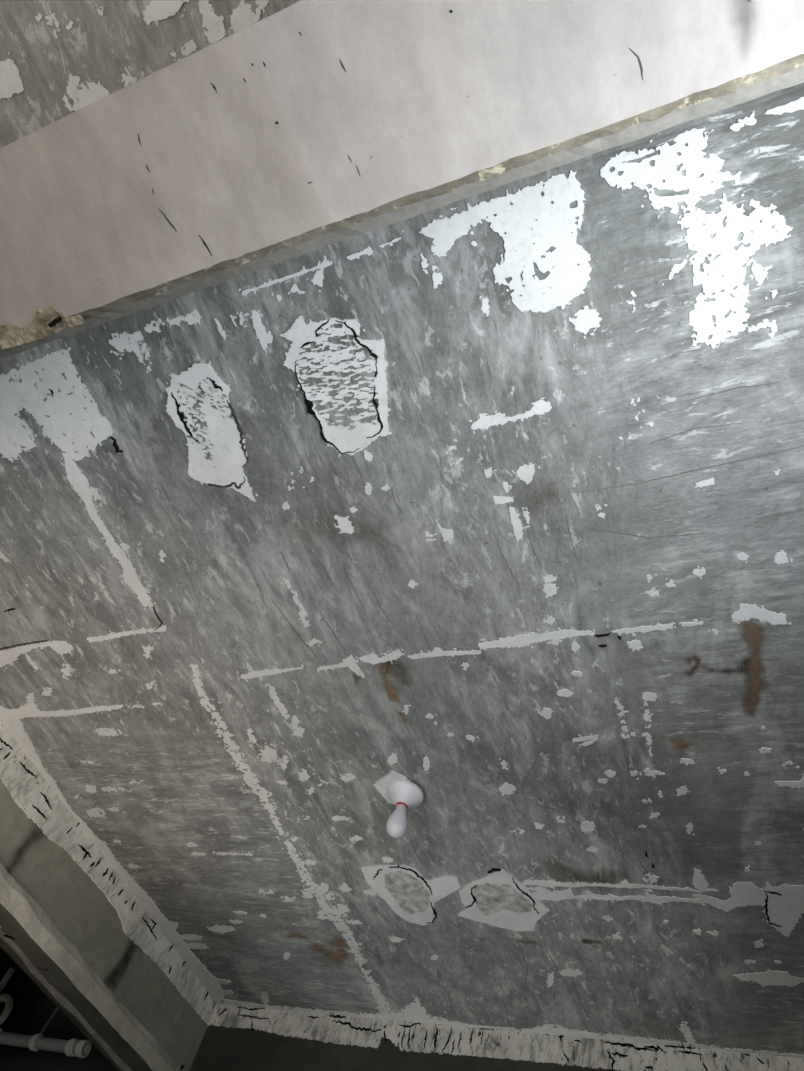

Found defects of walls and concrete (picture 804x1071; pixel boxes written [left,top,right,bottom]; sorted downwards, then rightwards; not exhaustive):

flaking render [0,52,25,101]
flaking render [143,0,269,62]
flaking render [419,170,602,339]
flaking render [600,127,794,349]
flaking render [0,347,114,465]
flaking render [108,309,202,373]
flaking render [165,361,258,502]
flaking render [215,310,392,462]
rust [380,663,404,717]
rust [687,623,764,715]
crack [0,738,186,974]
flaking render [0,722,804,1071]